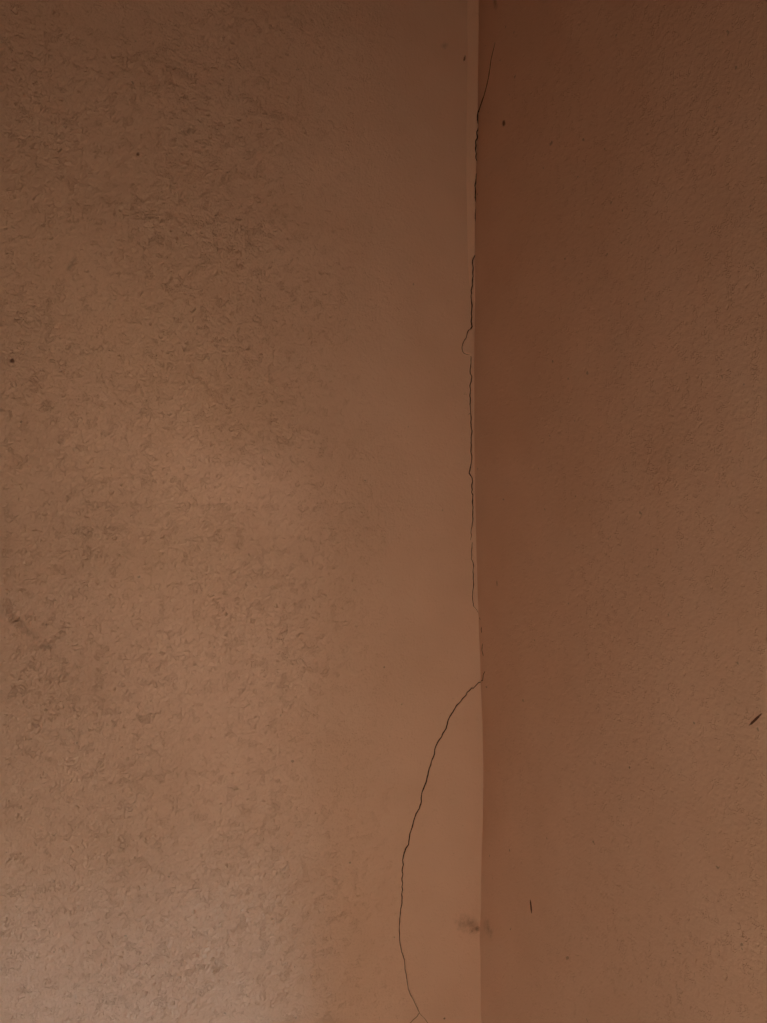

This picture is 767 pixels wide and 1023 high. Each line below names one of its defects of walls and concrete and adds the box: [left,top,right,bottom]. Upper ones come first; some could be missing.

crack [474,44,495,222]
crack [398,249,485,1023]